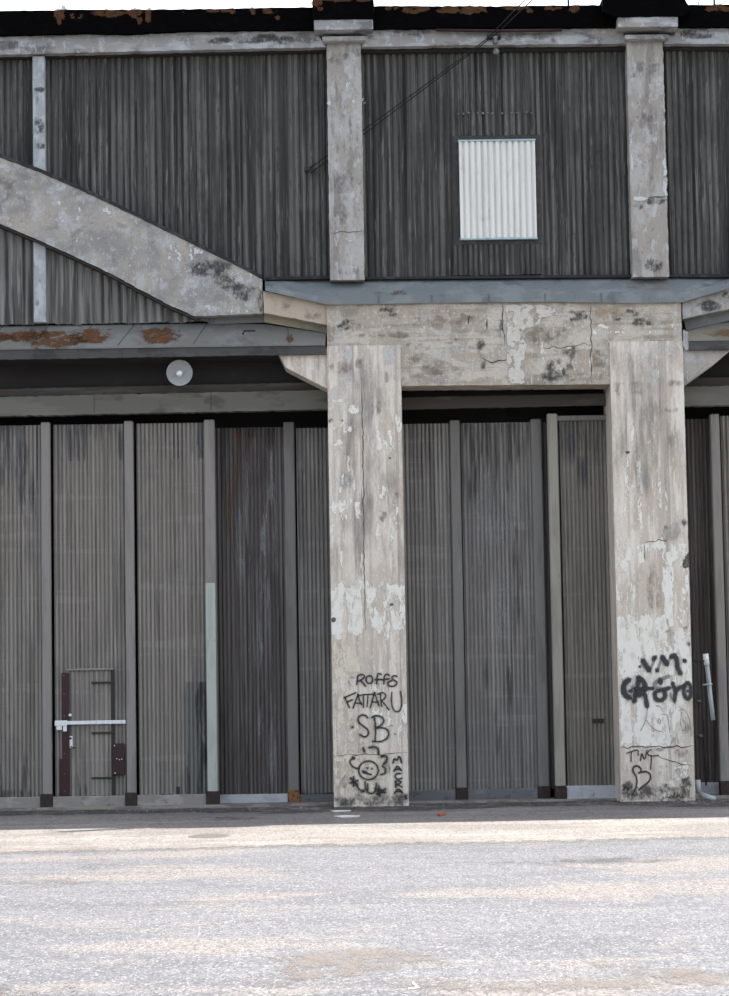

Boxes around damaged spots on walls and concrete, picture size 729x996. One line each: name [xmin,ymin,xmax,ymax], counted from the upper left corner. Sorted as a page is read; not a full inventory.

corrosion [53,5,151,25]
corrosion [311,0,370,11]
corrosion [385,5,487,15]
corrosion [502,4,580,13]
corrosion [0,328,111,349]
corrosion [141,327,181,344]
crack [468,302,507,364]
crack [546,304,592,375]
peeling [375,414,402,459]
peeling [329,398,361,535]
peeling [616,419,692,751]
peeling [331,554,407,807]